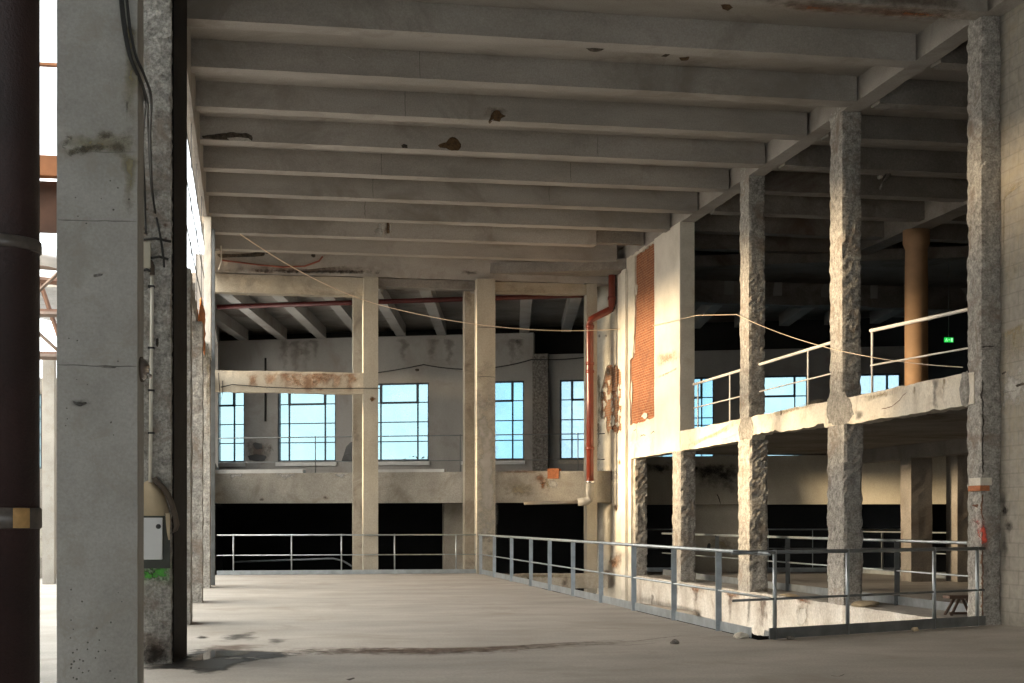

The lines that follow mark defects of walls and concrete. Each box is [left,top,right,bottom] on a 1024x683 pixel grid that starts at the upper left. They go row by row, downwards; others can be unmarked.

water stain [65,133,135,187]
spalling [202,132,253,141]
spalling [438,137,461,151]
flaking render [596,230,655,434]